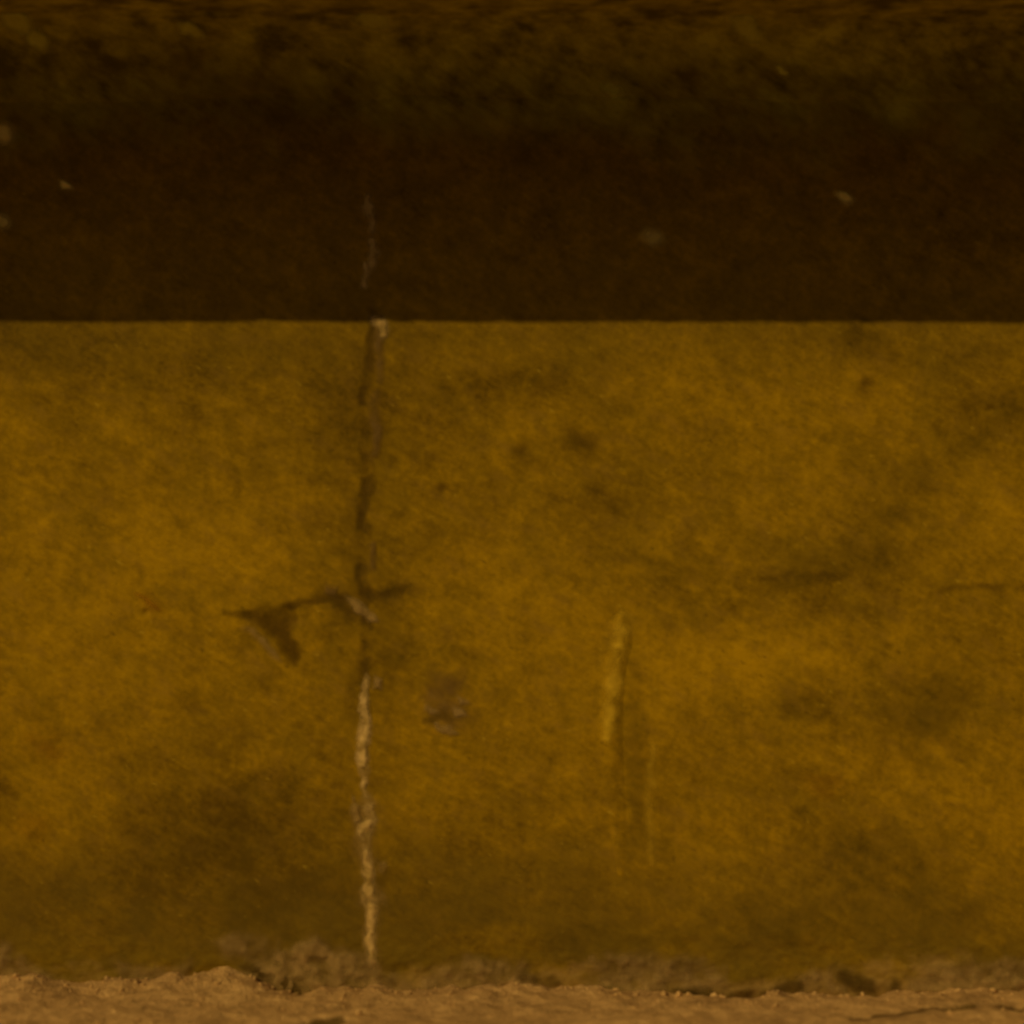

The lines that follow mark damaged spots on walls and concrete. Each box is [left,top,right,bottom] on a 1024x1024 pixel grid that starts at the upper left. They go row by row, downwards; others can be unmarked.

water stain [355,678,371,789]
water stain [352,803,385,984]